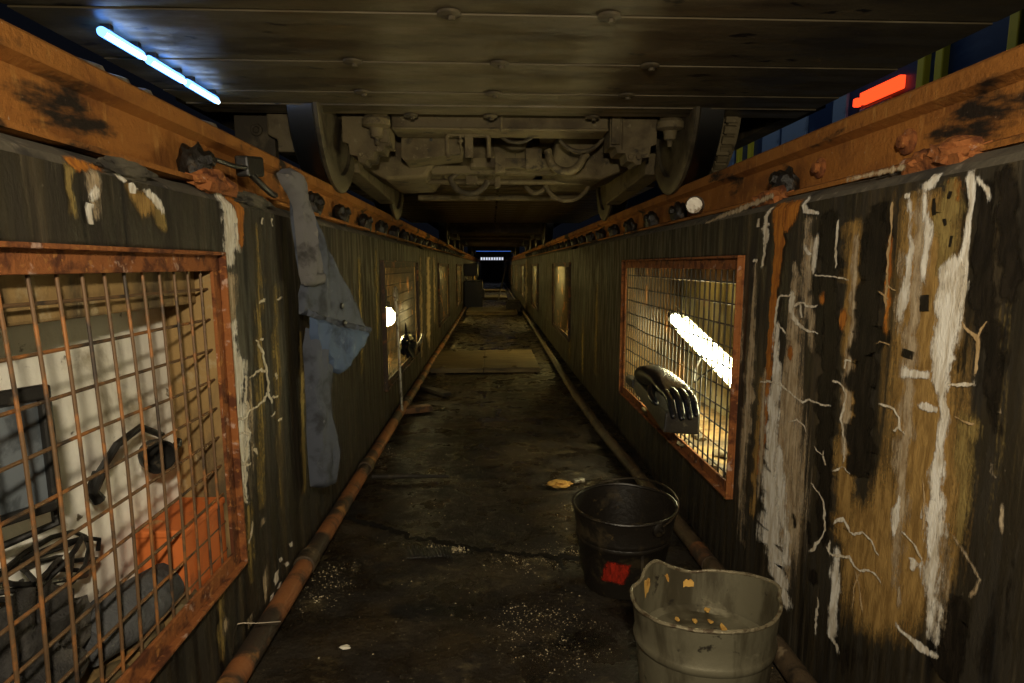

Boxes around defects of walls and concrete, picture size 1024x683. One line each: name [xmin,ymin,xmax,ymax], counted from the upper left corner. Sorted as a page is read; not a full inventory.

rust [756,199,804,475]
crack [773,291,818,335]
rust [839,309,847,330]
crack [962,321,987,374]
leakage [214,193,289,602]
crack [238,340,278,503]
leakage [737,170,990,659]
crack [880,403,905,435]
crack [760,359,881,612]
crack [901,479,926,563]
leakage [217,593,227,660]